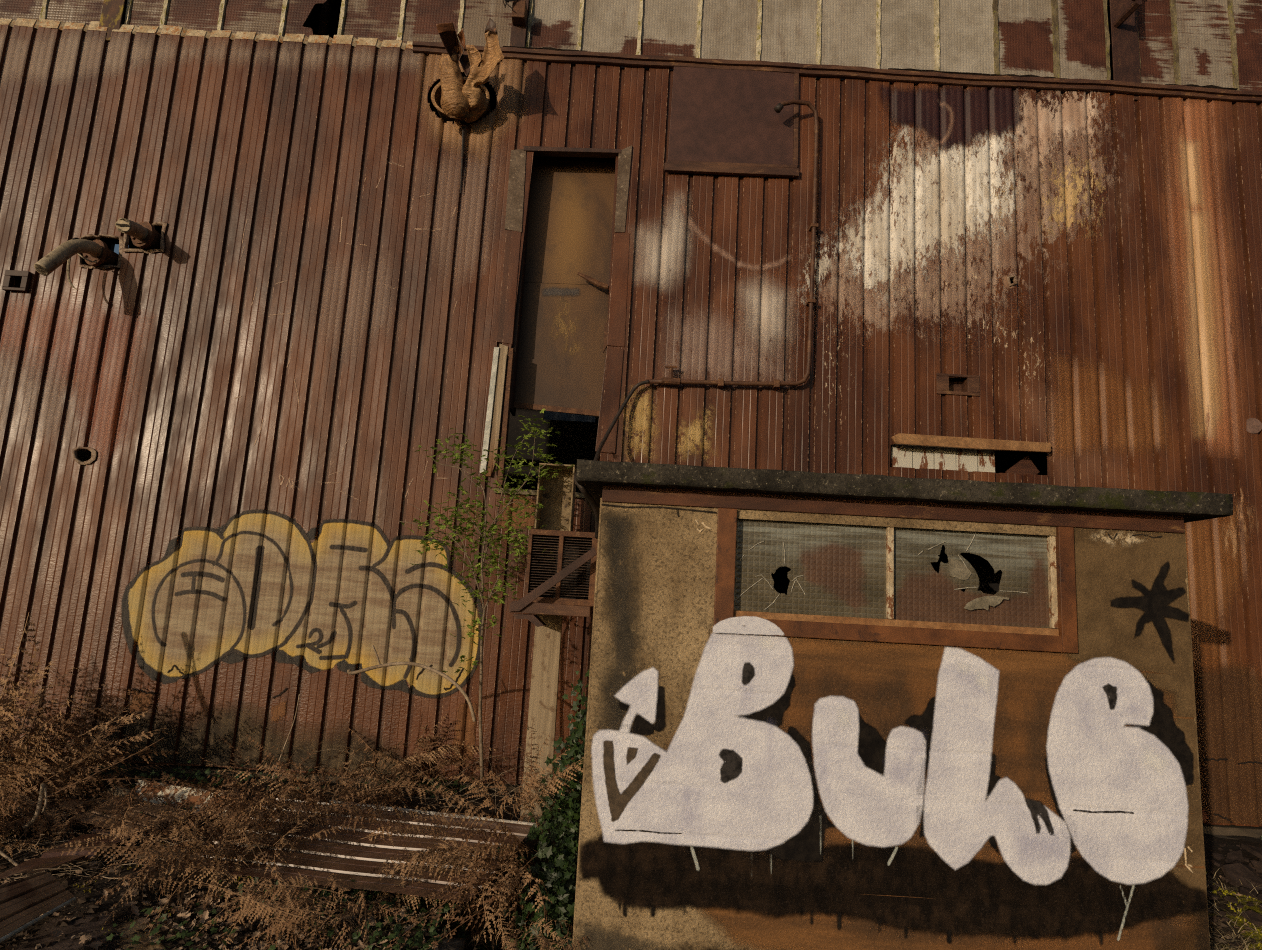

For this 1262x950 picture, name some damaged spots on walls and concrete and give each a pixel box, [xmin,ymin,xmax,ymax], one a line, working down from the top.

peeling [804,91,1106,410]